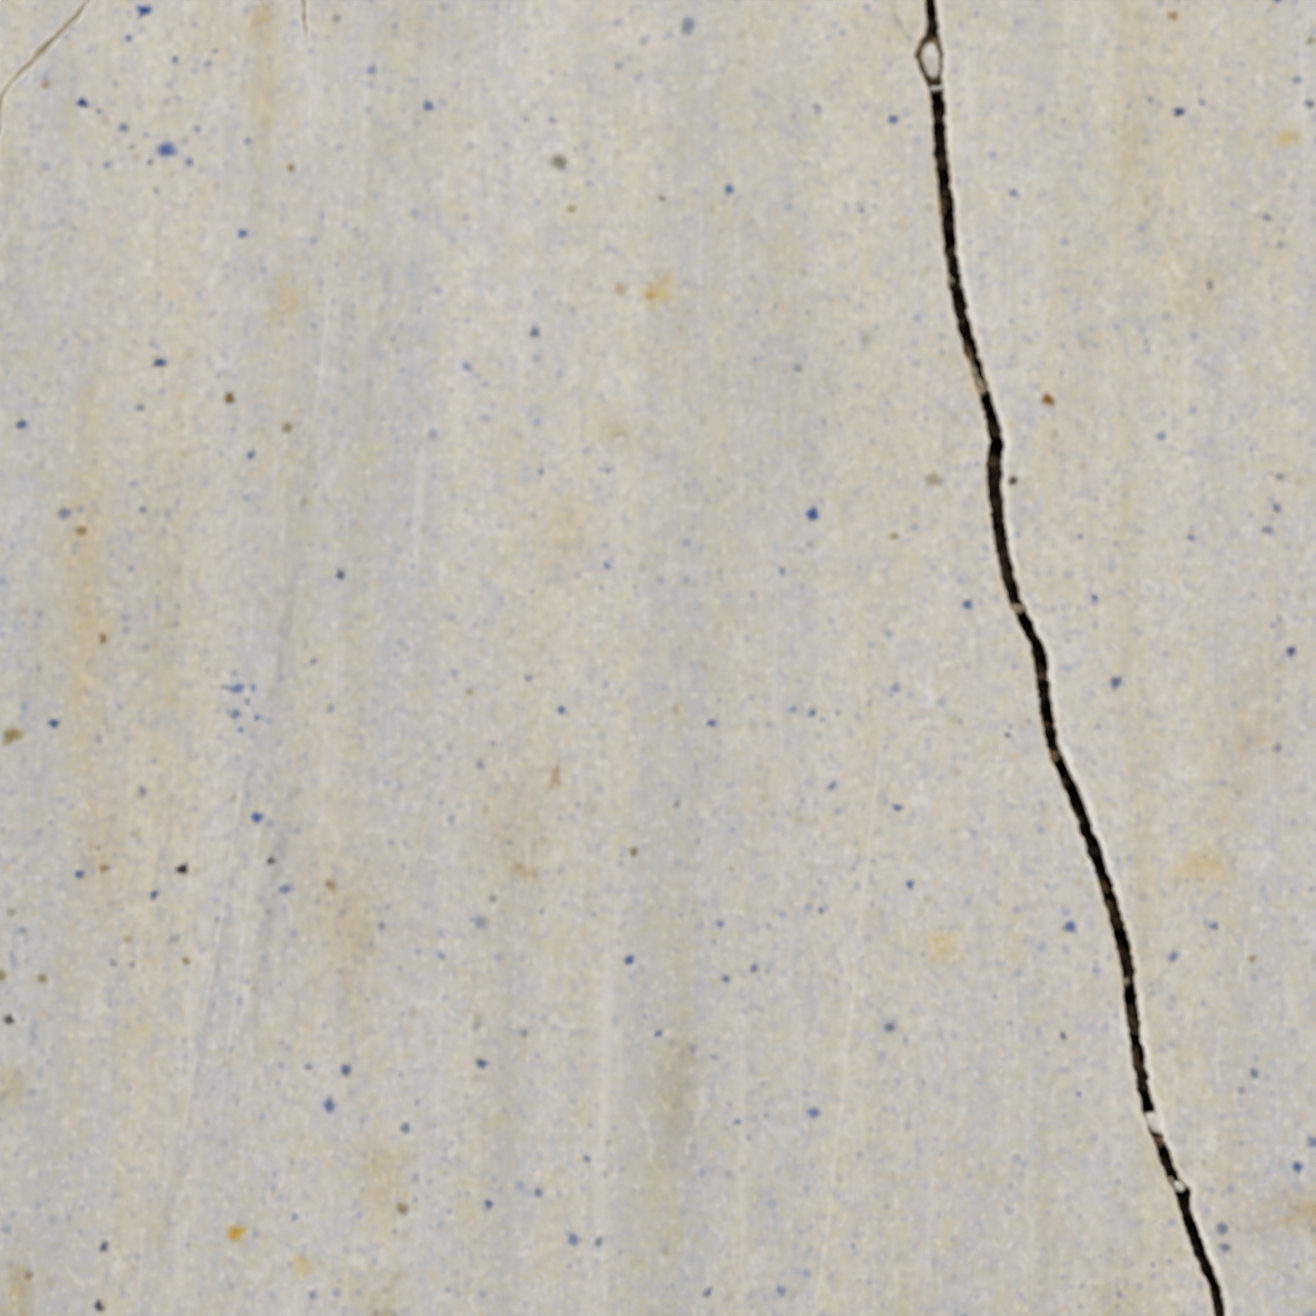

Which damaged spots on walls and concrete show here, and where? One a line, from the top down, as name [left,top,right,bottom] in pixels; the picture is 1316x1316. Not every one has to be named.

crack [0,0,94,138]
crack [908,0,1234,1316]